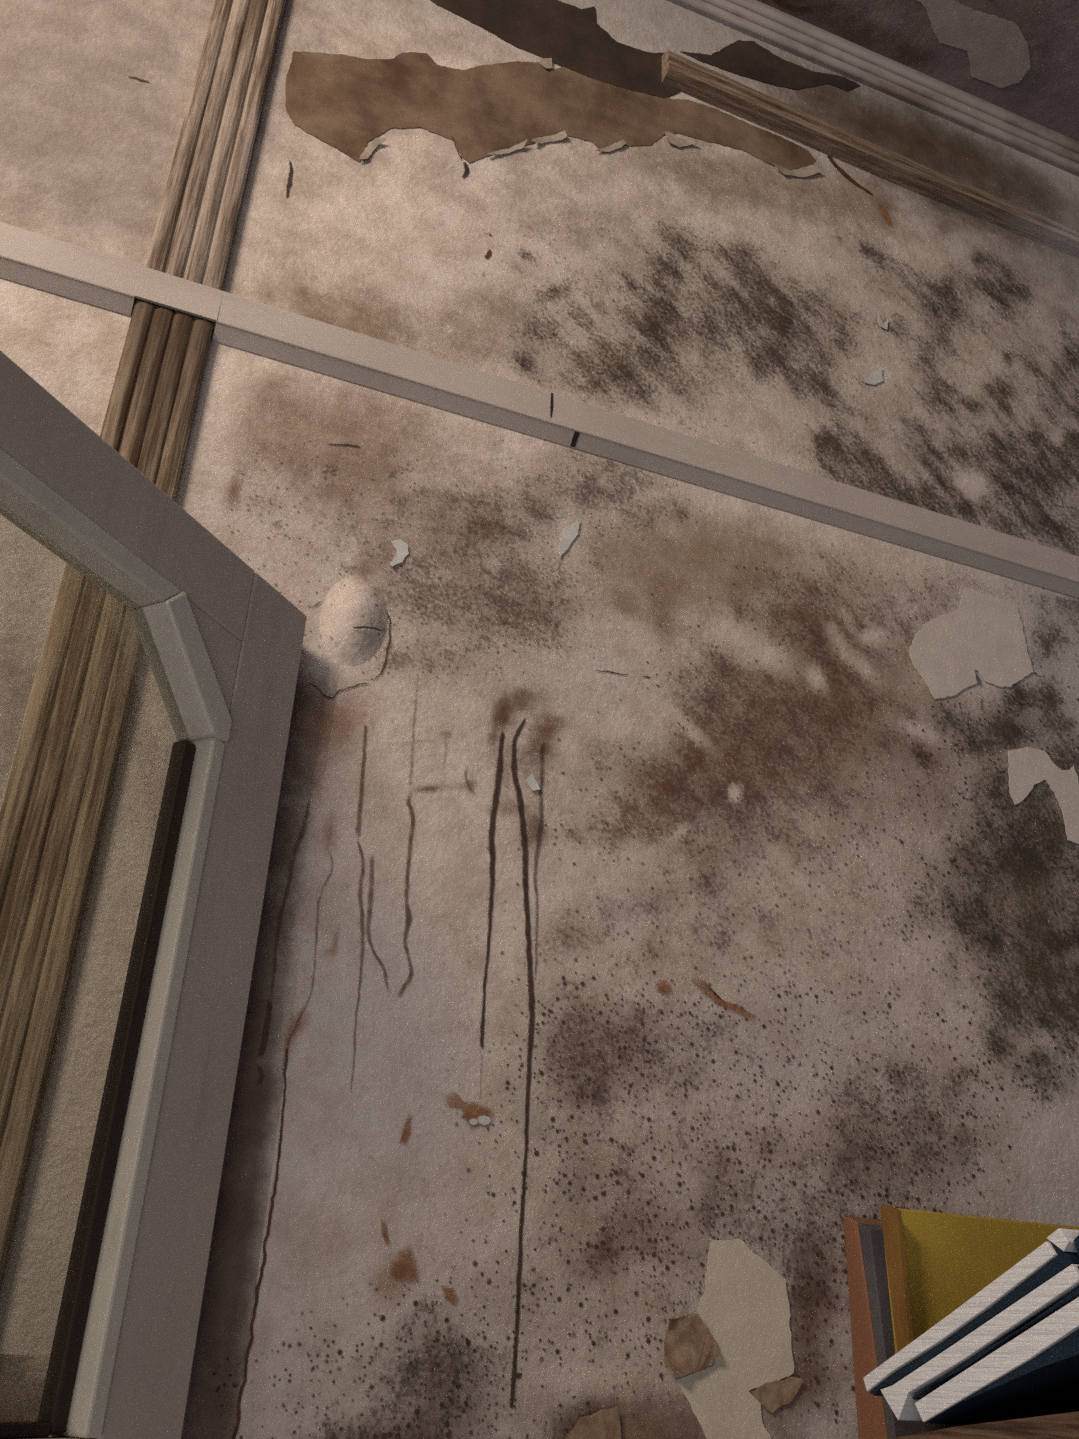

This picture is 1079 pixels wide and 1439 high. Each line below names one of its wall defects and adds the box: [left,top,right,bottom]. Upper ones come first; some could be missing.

peeling [285,0,860,178]
peeling [916,0,1030,88]
damp [515,227,1079,556]
crack [311,611,391,699]
peeling [909,587,1033,699]
peeling [1008,747,1079,844]
damp [231,451,1079,1439]
damp [186,686,322,1439]
crack [232,1049,288,1439]
peeling [564,1406,621,1439]
peeling [664,1238,804,1439]